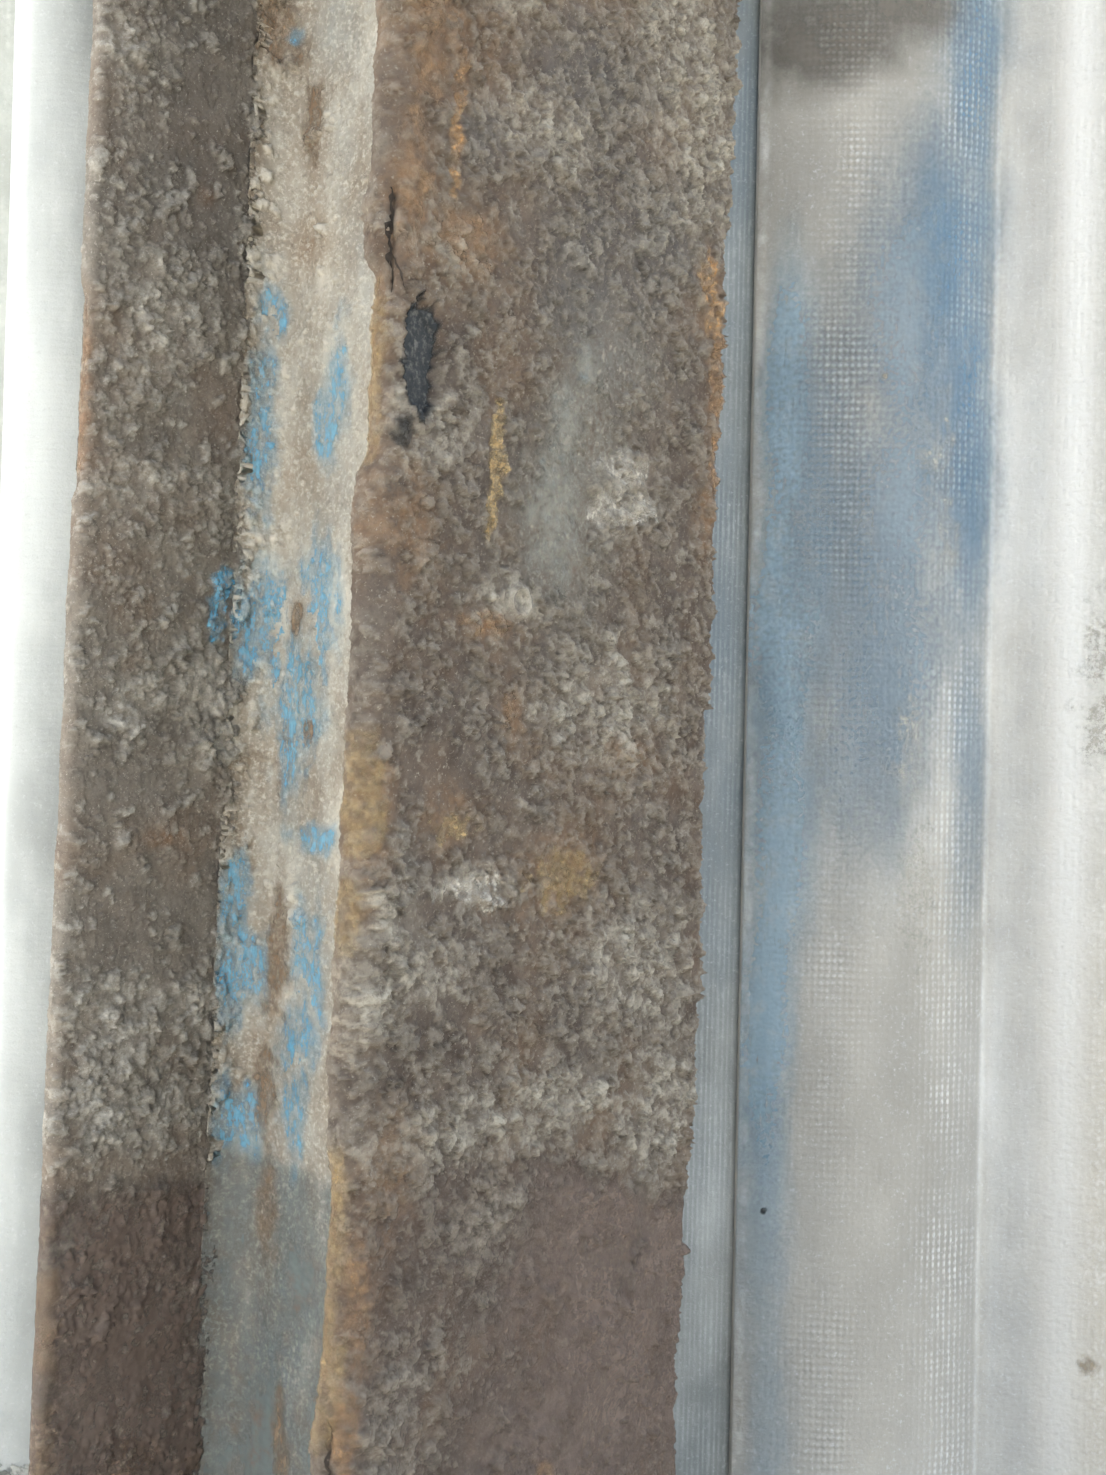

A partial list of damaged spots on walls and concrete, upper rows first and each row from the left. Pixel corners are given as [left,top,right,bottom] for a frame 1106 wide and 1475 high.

crack [384,187,405,292]
peeling [244,357,276,490]
peeling [261,288,287,334]
peeling [315,347,346,458]
spalling [400,291,441,423]
peeling [207,549,341,787]
peeling [301,827,334,852]
peeling [217,858,265,1018]
peeling [284,916,321,1153]
peeling [217,1083,259,1156]
spalling [0,1464,29,1475]
crack [324,1418,333,1475]